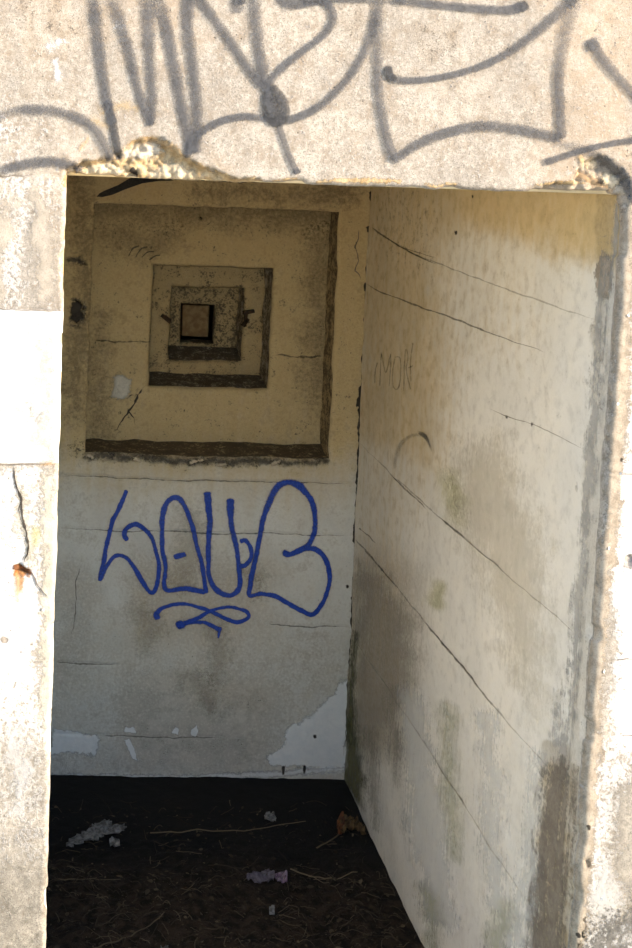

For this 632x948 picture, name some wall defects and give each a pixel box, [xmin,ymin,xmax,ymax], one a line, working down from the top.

spalling [62,136,297,187]
spalling [316,177,402,185]
crack [63,318,395,585]
rust [13,564,32,595]
crack [0,463,48,598]
peeling [534,152,632,948]
peeling [267,679,348,774]
crack [271,578,353,756]
water stain [526,754,579,948]
water stain [579,905,632,948]